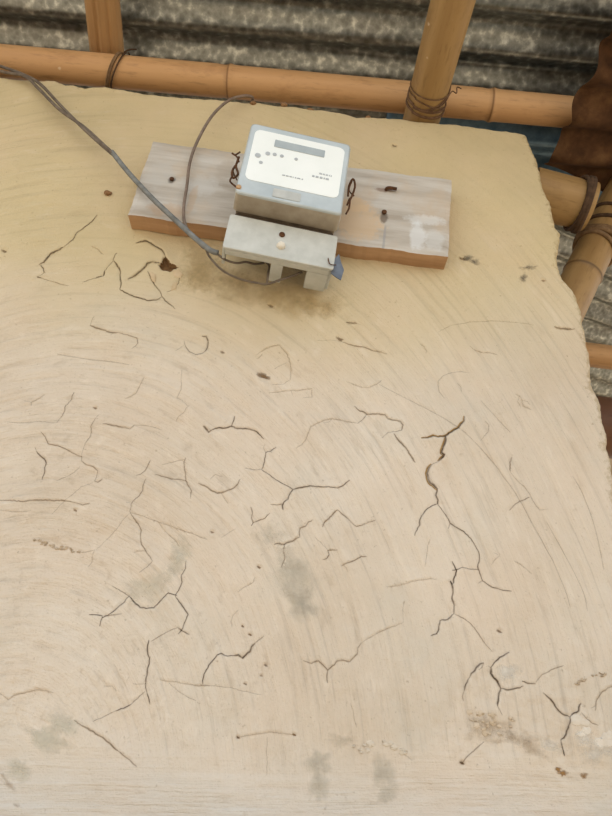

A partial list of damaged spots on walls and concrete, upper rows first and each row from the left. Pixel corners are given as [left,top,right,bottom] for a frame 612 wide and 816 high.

crack [84,240,179,309]
crack [205,416,348,526]
crack [394,416,509,636]
crack [89,565,188,711]
crack [202,643,255,683]
crack [464,652,580,756]